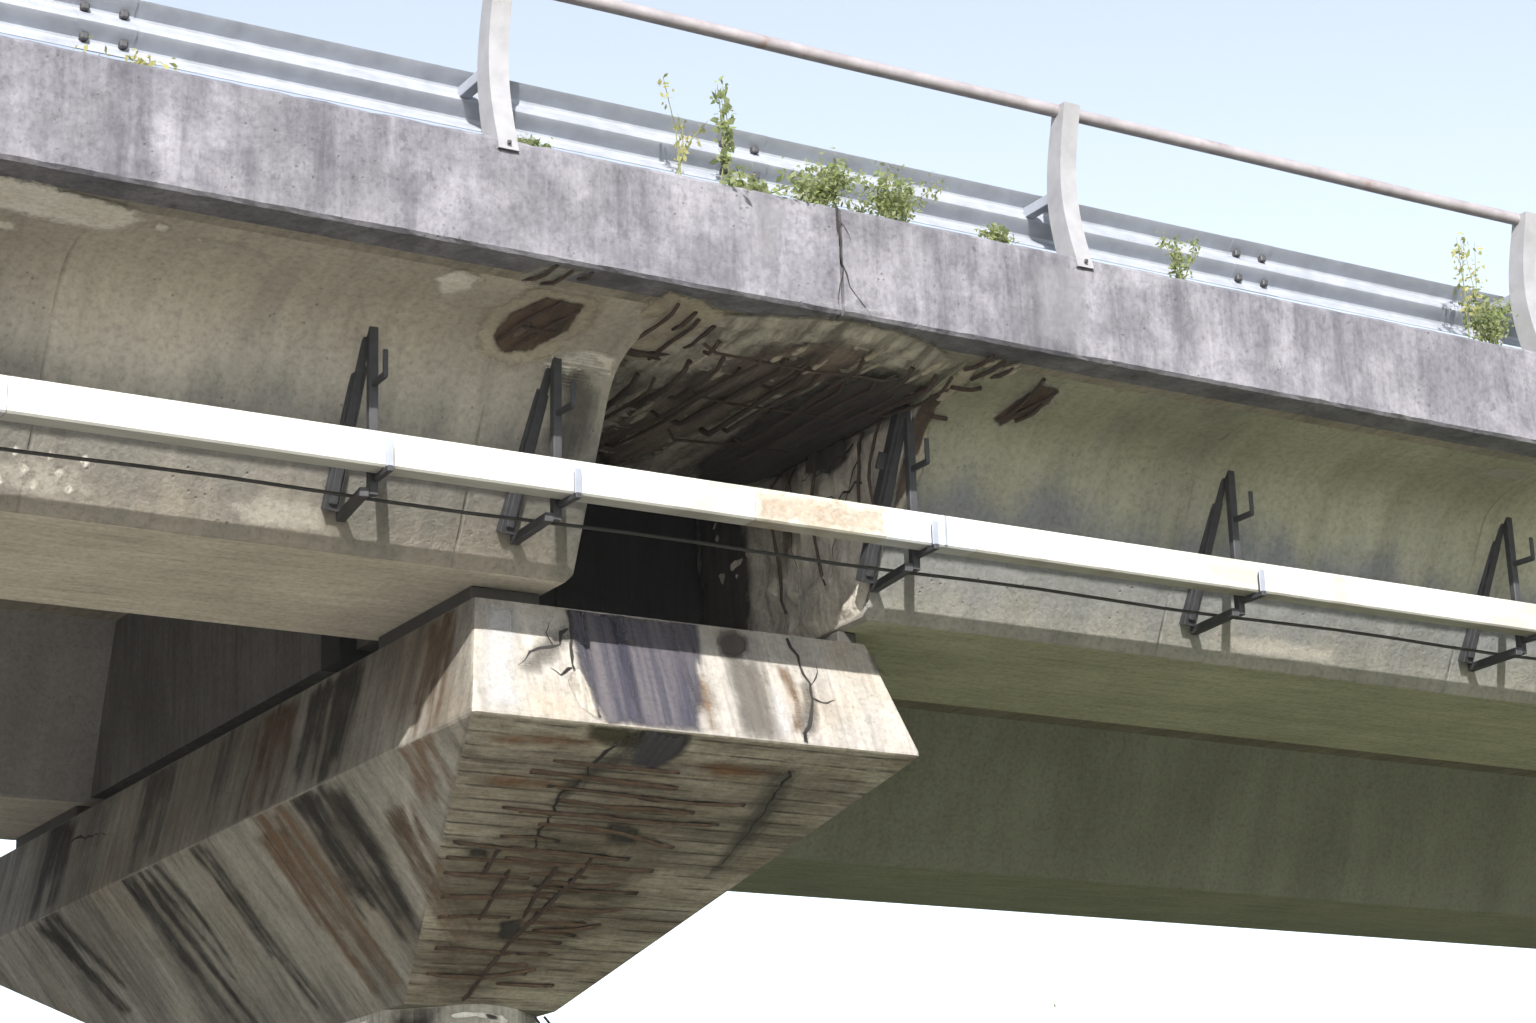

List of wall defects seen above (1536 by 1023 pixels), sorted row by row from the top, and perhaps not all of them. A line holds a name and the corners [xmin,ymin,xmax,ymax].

crack [835,207,872,316]
spalling [478,264,1021,509]
spalling [994,377,1059,425]
spalling [697,519,883,660]
damp [30,824,130,1011]
damp [122,766,256,1023]
damp [193,846,316,1006]
damp [292,665,414,939]
crack [518,612,637,848]
damp [566,609,700,769]
crack [704,638,834,878]